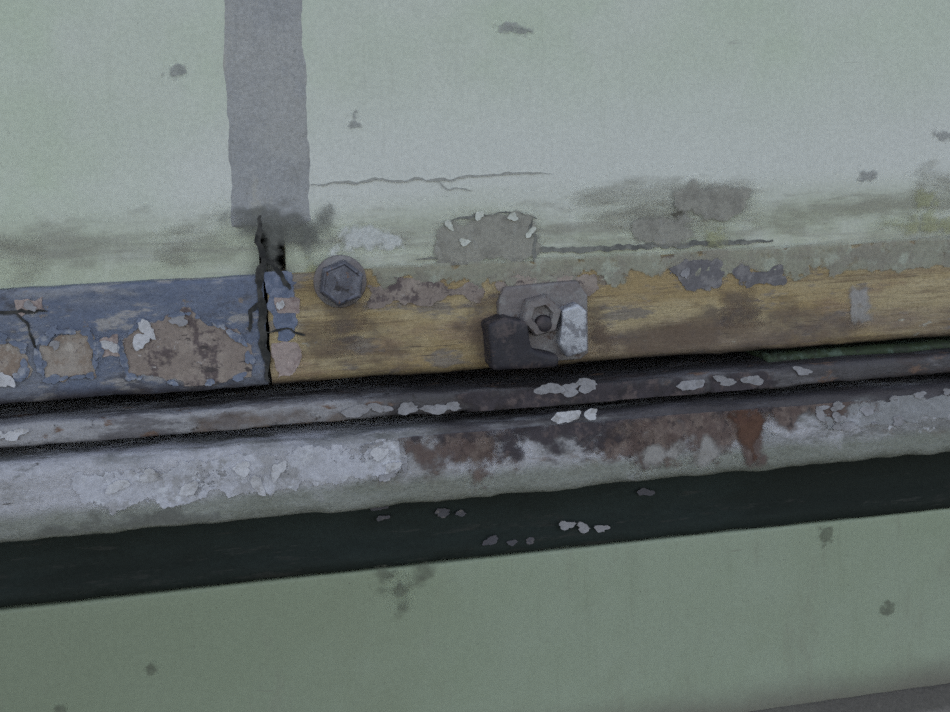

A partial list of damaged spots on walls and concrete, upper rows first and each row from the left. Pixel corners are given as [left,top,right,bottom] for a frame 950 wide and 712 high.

crack [310,172,550,191]
damp [235,206,333,271]
damp [330,225,402,256]
crack [444,211,773,261]
crack [248,215,305,381]
crack [0,308,48,349]
peeling [0,307,256,388]
peeling [71,439,408,515]
corrosion [398,431,508,488]
peeling [534,378,597,397]
peeling [551,408,597,424]
corrosion [598,401,877,469]